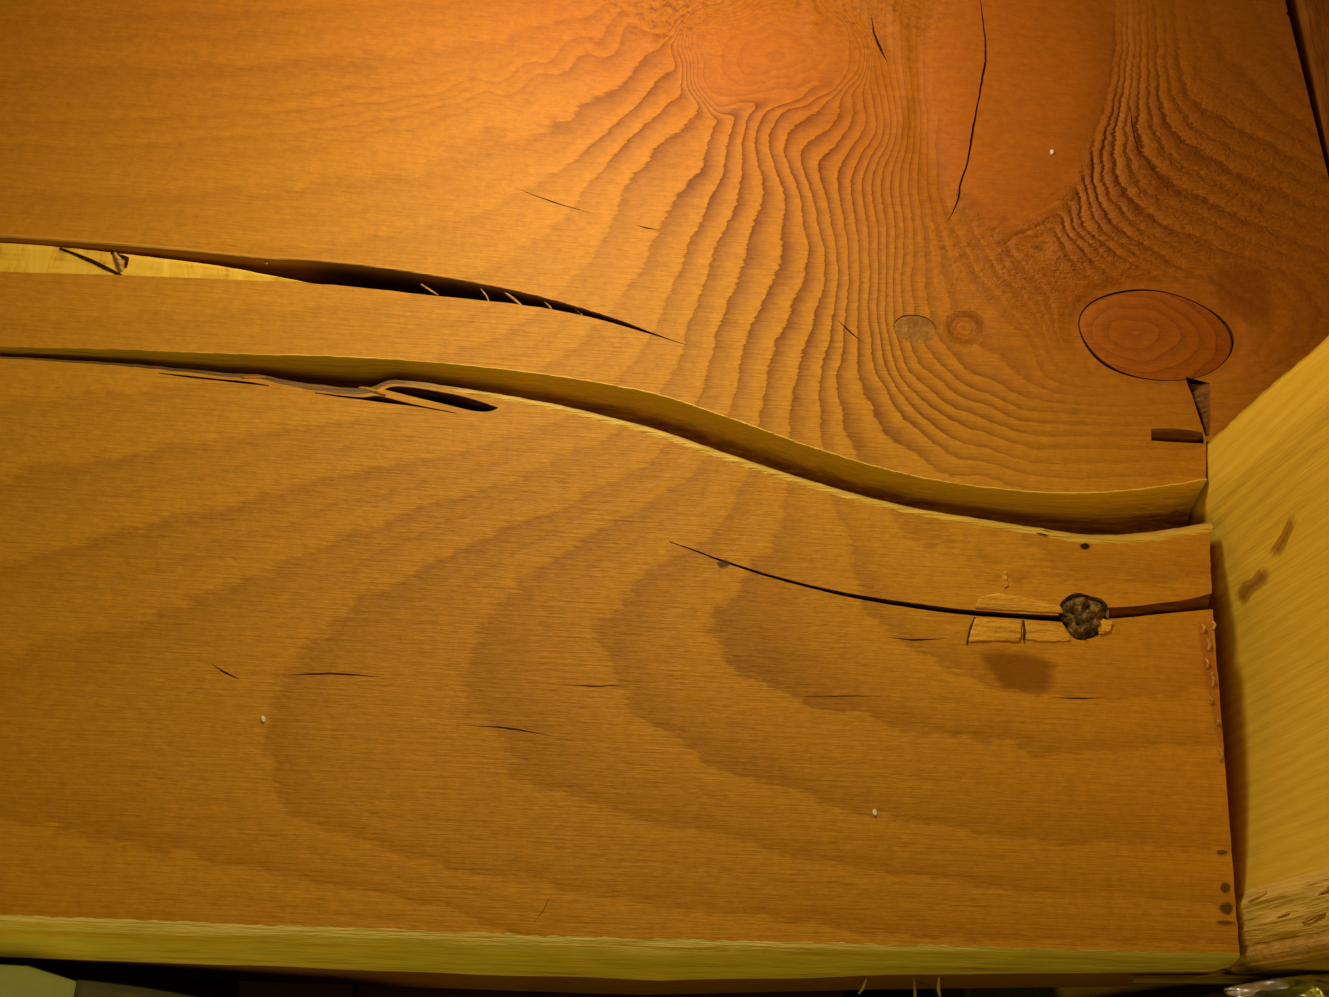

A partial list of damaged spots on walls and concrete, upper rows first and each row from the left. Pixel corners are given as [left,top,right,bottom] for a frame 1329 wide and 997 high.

crack [946,0,987,223]
crack [0,234,686,345]
crack [0,346,1213,544]
crack [669,541,1067,641]
crack [1102,593,1212,620]
damp [988,655,1046,687]